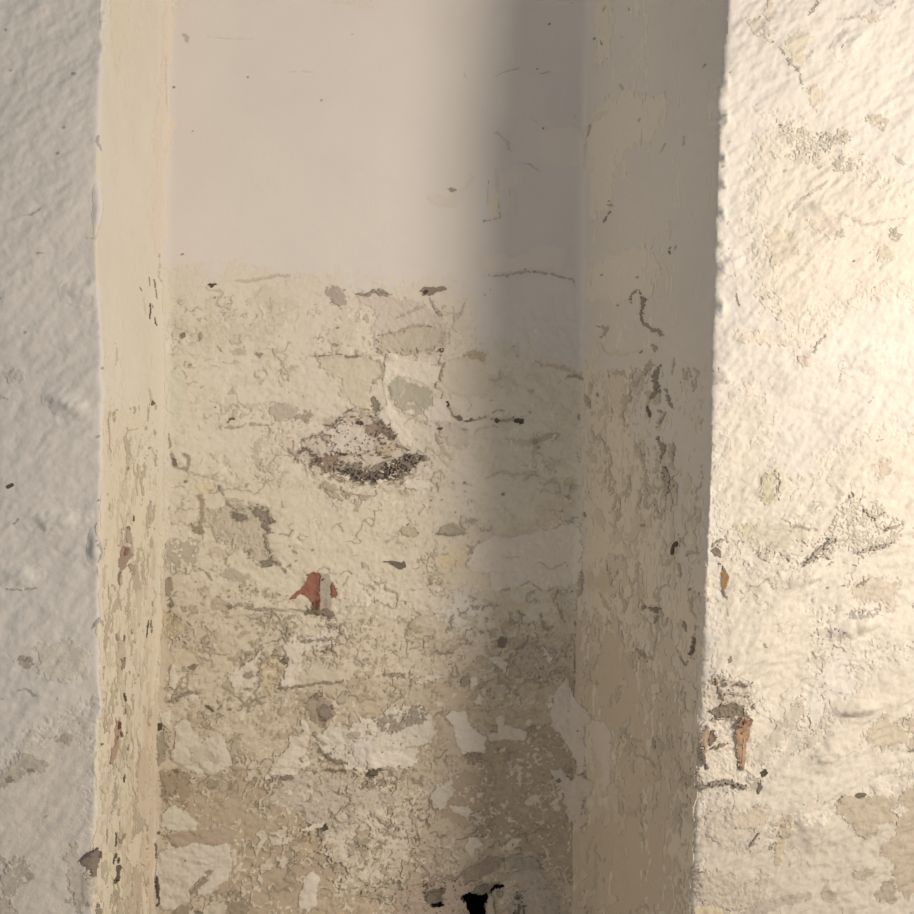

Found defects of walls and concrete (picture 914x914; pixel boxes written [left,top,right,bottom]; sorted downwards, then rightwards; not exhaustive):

spalling [358,286,447,357]
spalling [294,396,432,502]
spalling [118,515,137,575]
spalling [190,501,279,568]
flaking render [290,572,338,621]
peeling [383,561,406,569]
water stain [0,250,914,914]
spalling [100,720,128,764]
peeling [115,622,577,914]
spalling [694,673,755,787]
rust [734,716,753,771]
peeling [835,783,914,914]